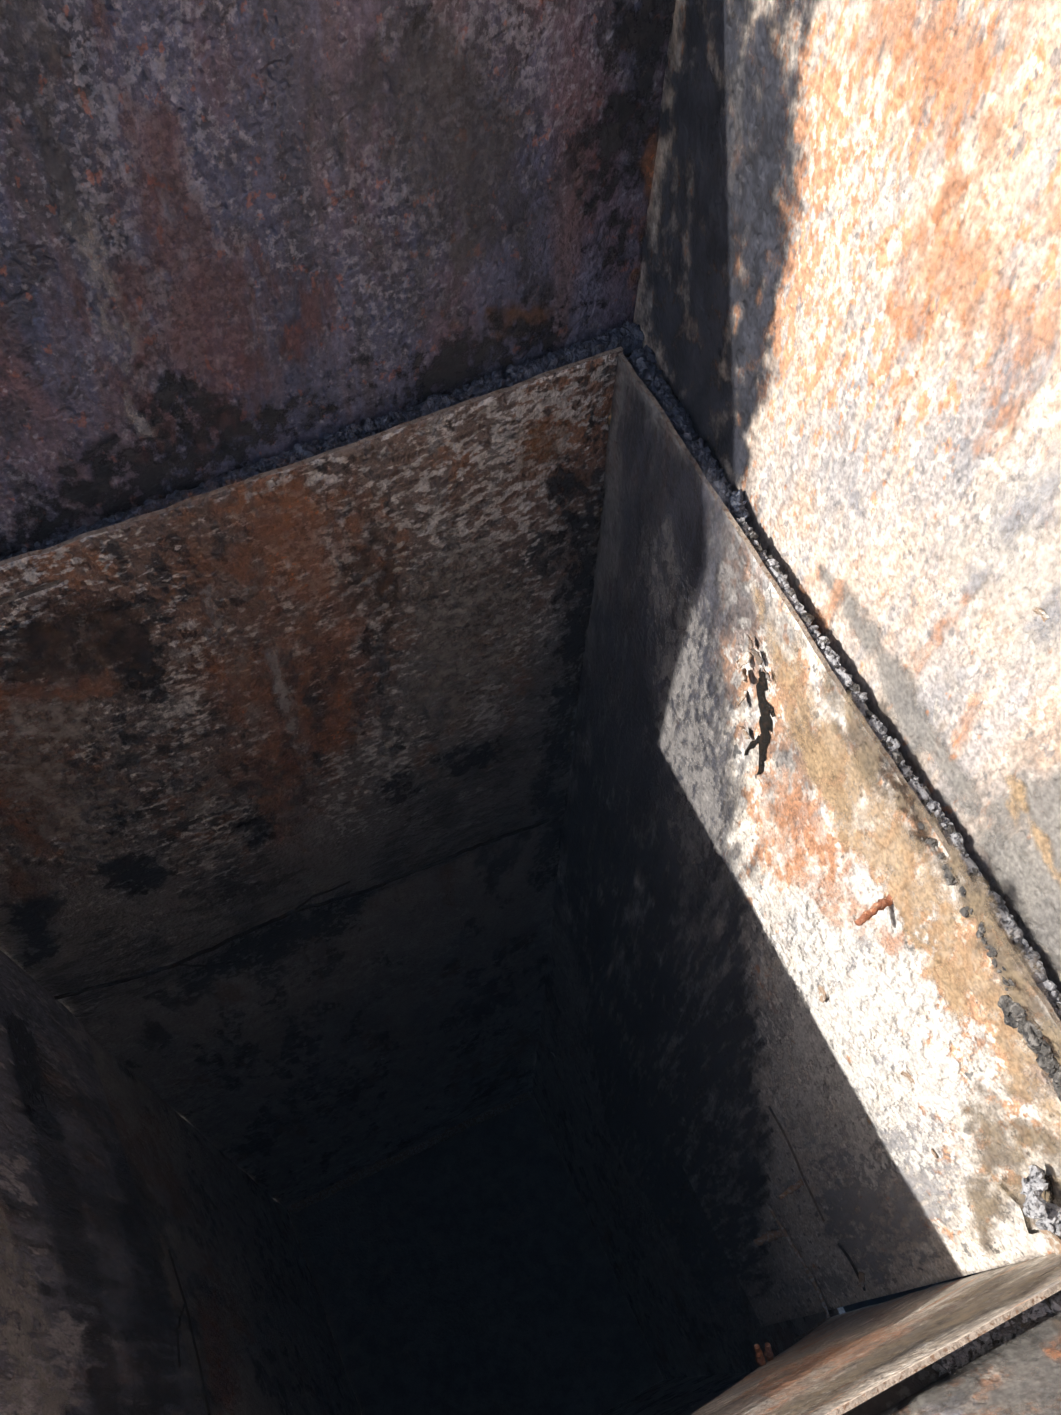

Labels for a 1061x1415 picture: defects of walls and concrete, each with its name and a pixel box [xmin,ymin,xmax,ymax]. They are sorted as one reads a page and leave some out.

damp [134,370,221,443]
crack [54,818,550,1000]
corrosion [755,588,1061,1137]